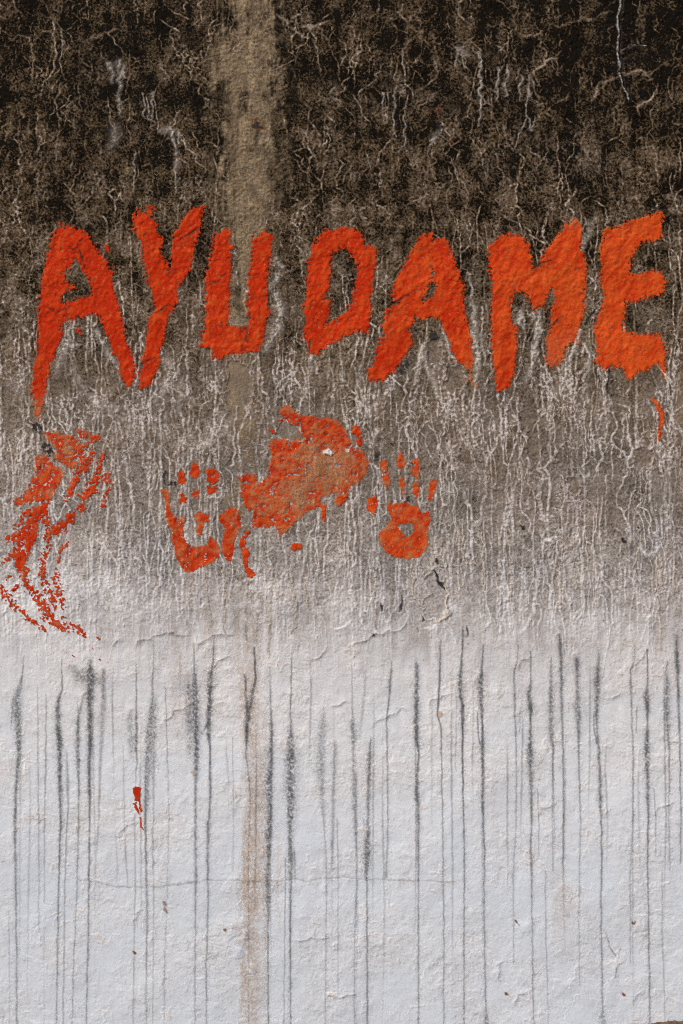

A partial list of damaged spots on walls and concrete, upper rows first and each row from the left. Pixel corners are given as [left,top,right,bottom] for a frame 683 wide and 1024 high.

efflorescence [56,328,71,369]
efflorescence [83,387,119,413]
efflorescence [150,359,184,402]
water stain [190,417,231,453]
efflorescence [265,258,284,351]
water stain [410,320,465,623]
water stain [467,273,486,412]
efflorescence [517,310,543,382]
efflorescence [539,329,631,470]
water stain [245,569,273,746]
water stain [78,665,93,818]
water stain [193,671,212,775]